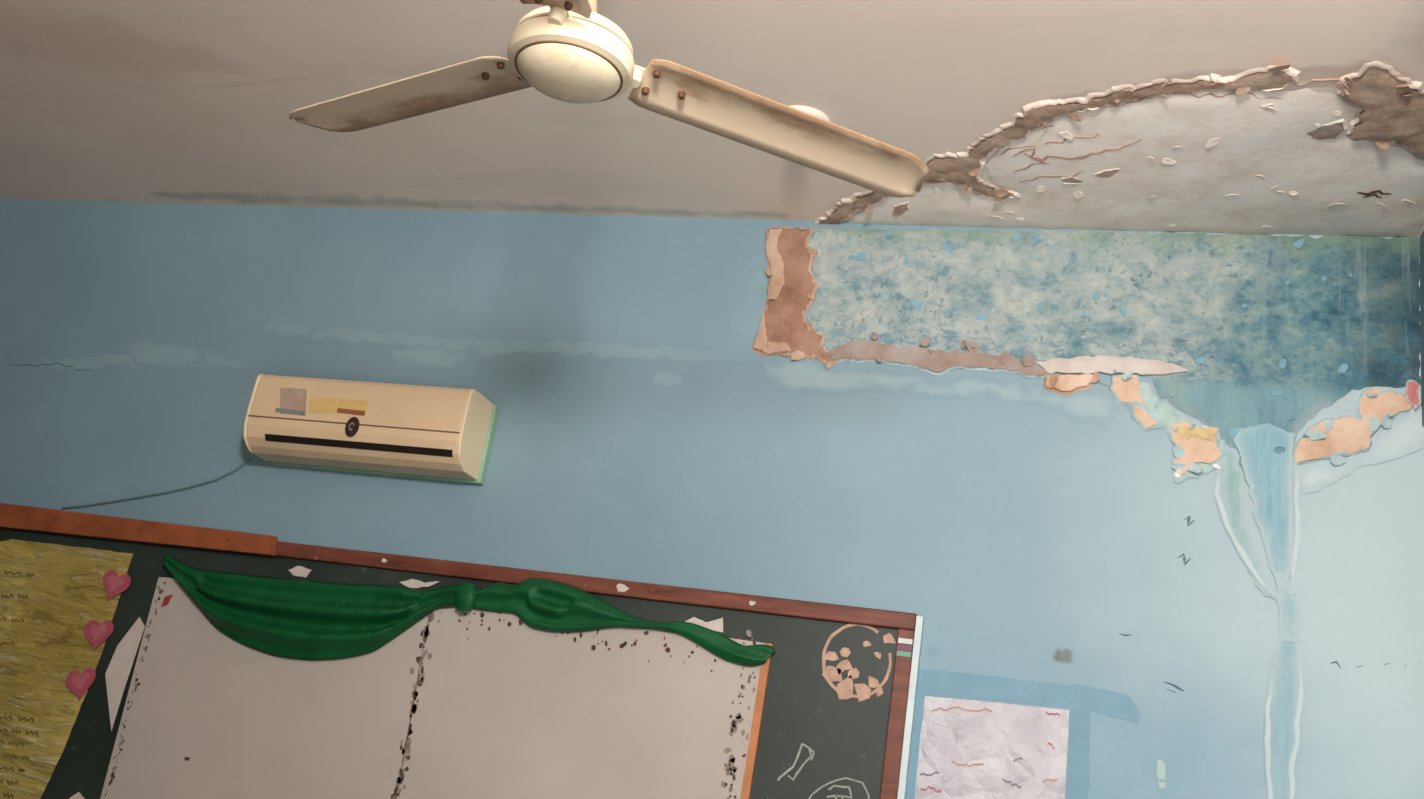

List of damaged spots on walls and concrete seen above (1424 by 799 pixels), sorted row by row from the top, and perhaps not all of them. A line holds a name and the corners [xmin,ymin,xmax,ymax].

crack [1001,124,1142,183]
spalling [923,64,1300,203]
crack [1125,79,1340,103]
spalling [1307,61,1424,159]
water stain [19,337,262,373]
peeling [752,190,1424,495]
water stain [254,313,1305,799]